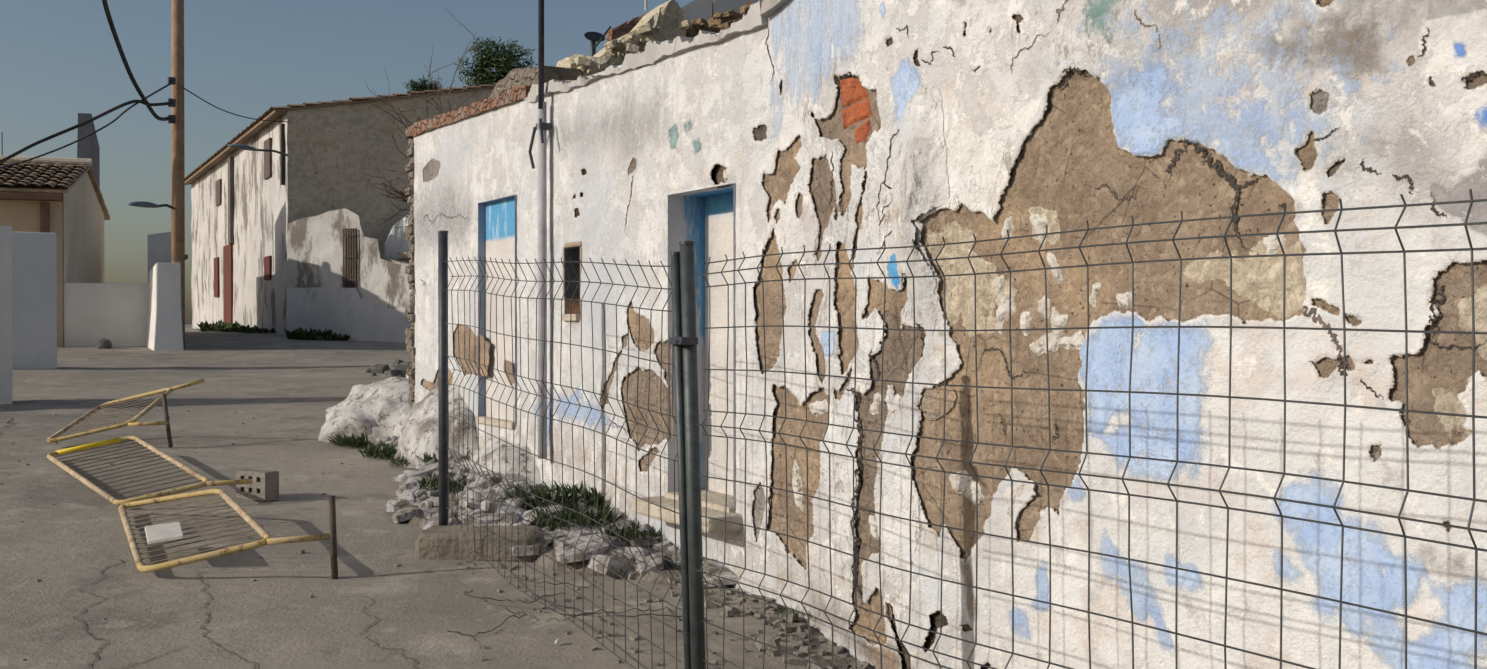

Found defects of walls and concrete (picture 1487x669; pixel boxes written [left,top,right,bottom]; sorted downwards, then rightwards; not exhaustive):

crack [1010,0,1068,75]
crack [1134,10,1161,51]
flaking render [1431,159,1487,235]
flaking render [535,301,674,472]
flaking render [752,0,1416,669]
flaking render [1309,260,1487,449]
crack [73,553,257,669]
crack [360,593,417,669]
peeling [1273,472,1487,669]